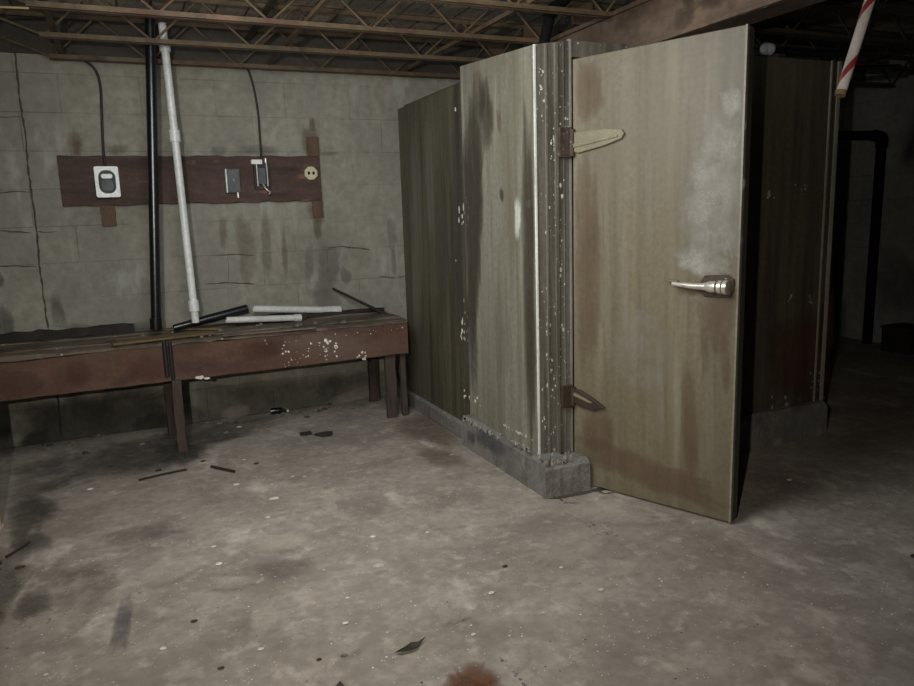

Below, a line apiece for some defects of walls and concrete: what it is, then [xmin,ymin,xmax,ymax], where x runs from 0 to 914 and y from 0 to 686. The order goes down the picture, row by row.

leakage [463,91,489,321]
leakage [523,131,534,392]
rust [449,667,496,686]